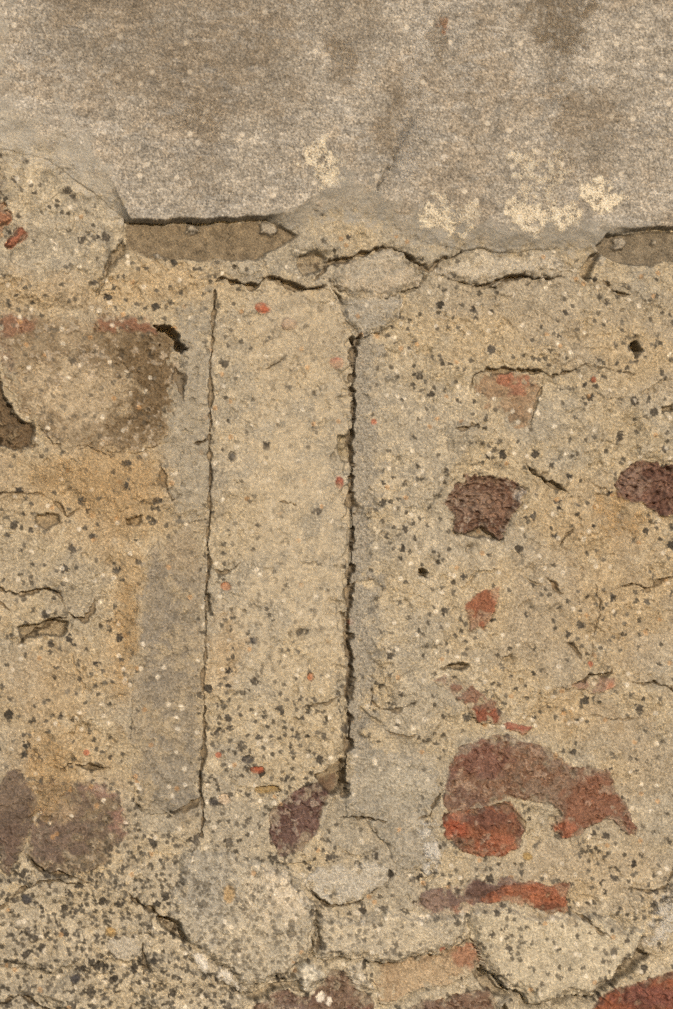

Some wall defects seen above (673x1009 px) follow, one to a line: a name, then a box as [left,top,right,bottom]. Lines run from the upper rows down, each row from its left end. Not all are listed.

peeling [419,192,478,239]
peeling [504,176,629,238]
spalling [96,220,300,297]
crack [217,246,462,293]
crack [471,272,566,288]
spalling [595,231,673,269]
spalling [0,372,39,454]
crack [470,364,636,428]
spalling [314,757,346,798]
crack [0,855,93,910]
crack [128,893,175,922]
crack [0,994,50,1009]